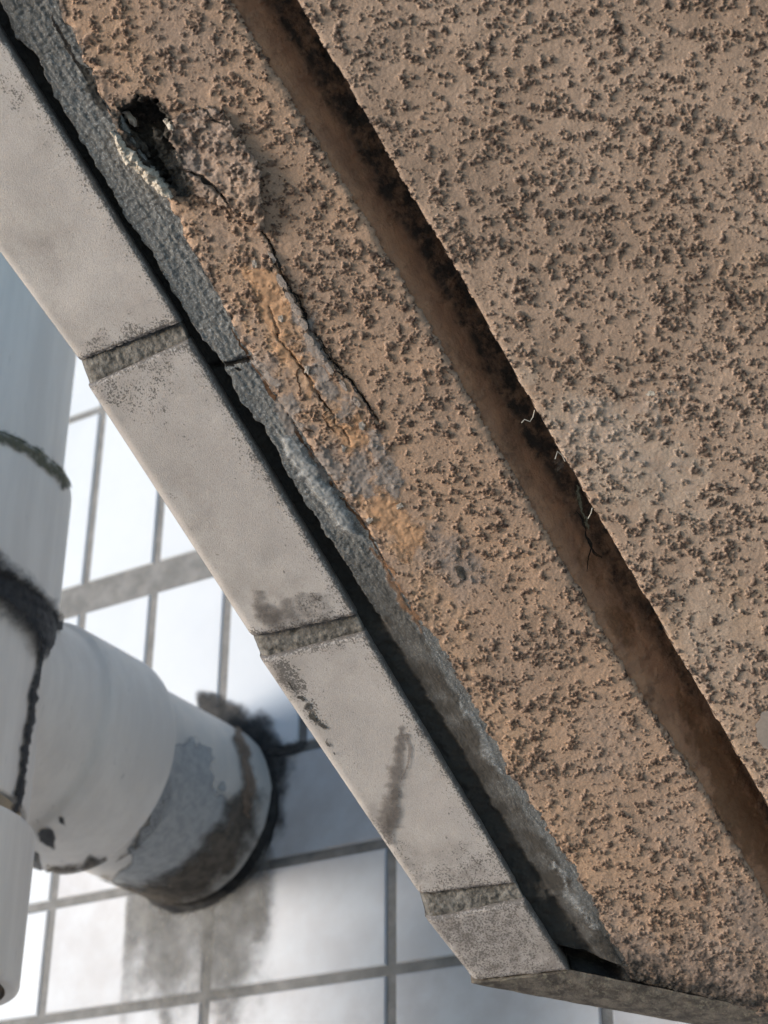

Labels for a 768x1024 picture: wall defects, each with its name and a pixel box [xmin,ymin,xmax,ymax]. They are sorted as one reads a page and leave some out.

peeling [110,94,265,232]
crack [214,231,381,555]
leakage [379,728,412,845]